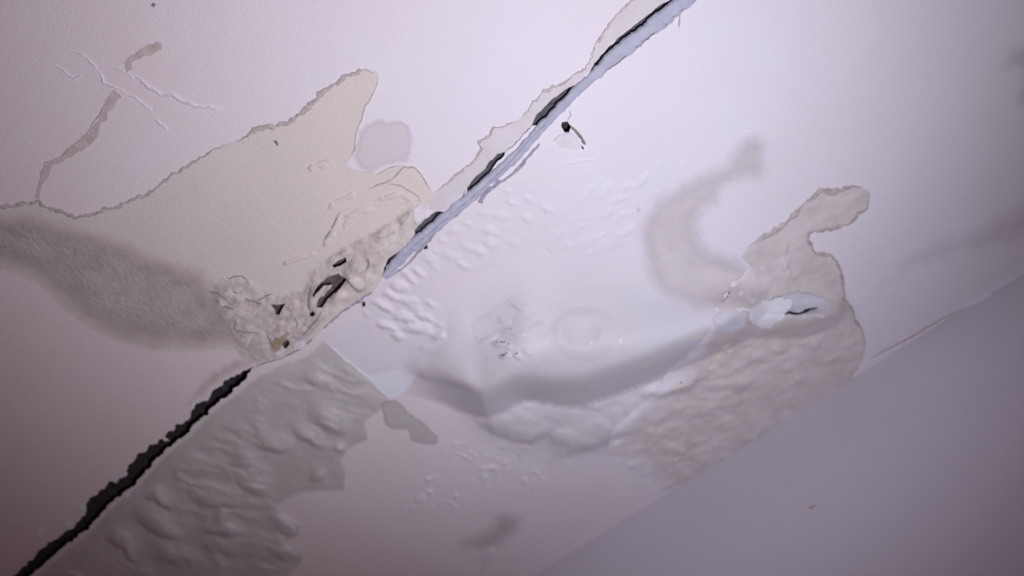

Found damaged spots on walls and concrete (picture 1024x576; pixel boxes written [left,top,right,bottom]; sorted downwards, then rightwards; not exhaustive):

water stain [0,225,228,340]
crack [35,42,228,199]
peeling [0,0,668,365]
crack [415,0,672,235]
water stain [637,145,758,303]
peeling [608,185,873,498]
crack [14,346,306,576]